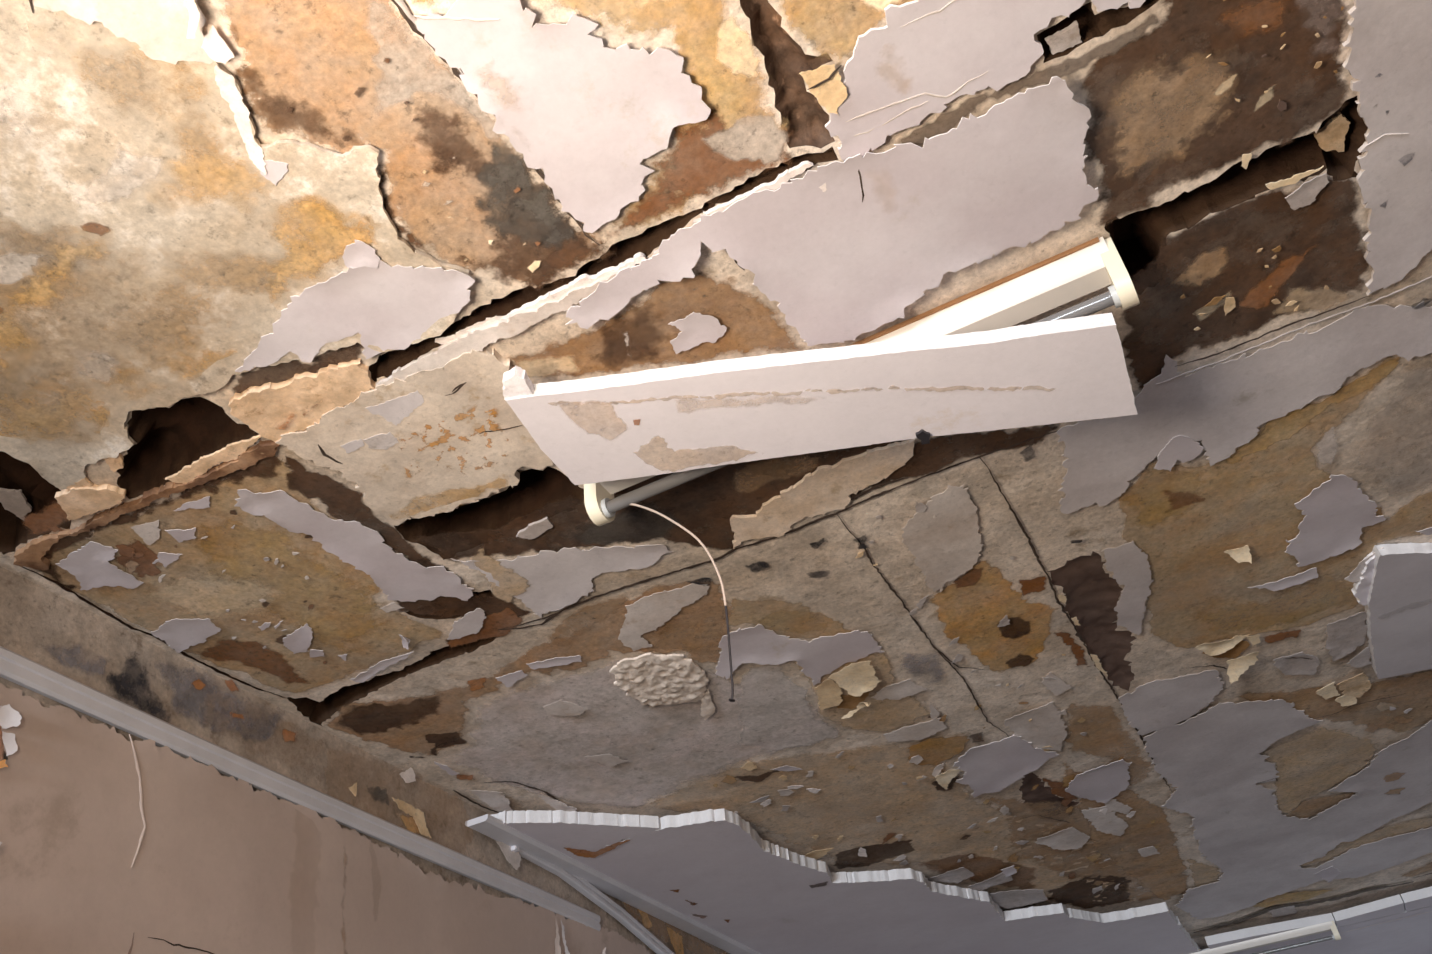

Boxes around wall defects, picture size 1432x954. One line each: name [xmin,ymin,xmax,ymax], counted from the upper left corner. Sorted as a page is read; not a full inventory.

peeling [29,0,288,185]
crack [391,0,495,116]
peeling [235,0,848,382]
crack [535,169,600,246]
crack [838,71,988,202]
spalling [1037,0,1159,63]
spalling [1104,96,1368,288]
spalling [0,397,261,555]
crack [318,444,343,464]
peeling [22,466,674,726]
crack [498,431,1170,788]
crack [453,775,577,813]